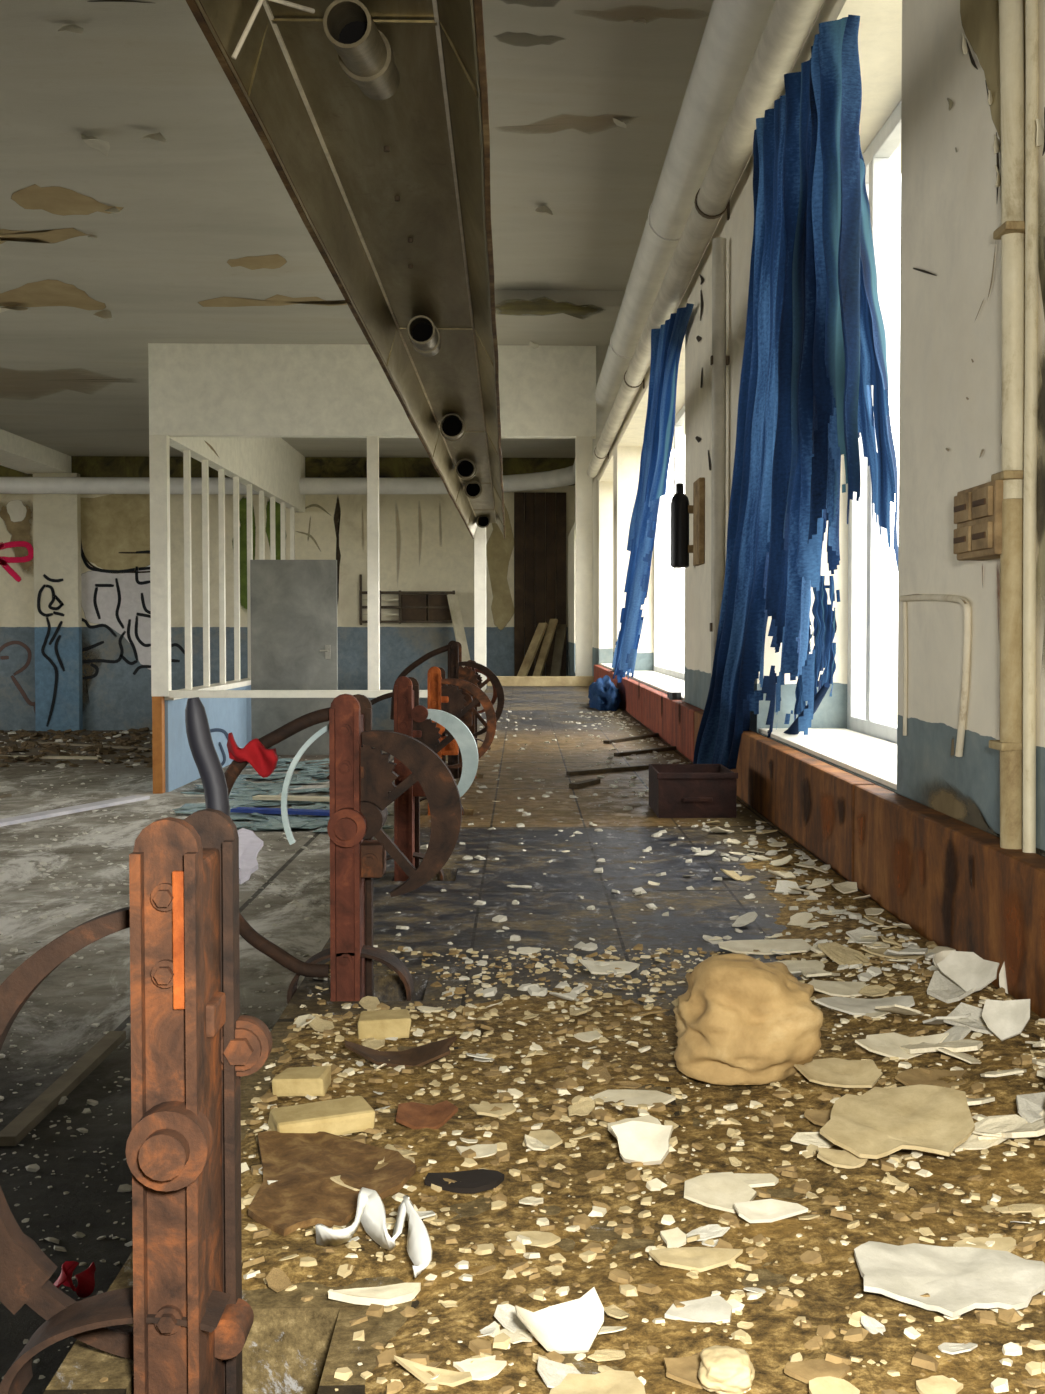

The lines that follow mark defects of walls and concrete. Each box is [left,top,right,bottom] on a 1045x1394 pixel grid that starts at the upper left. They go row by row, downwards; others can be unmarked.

peeling [960,0,1001,187]
peeling [1036,119,1045,146]
peeling [0,184,124,244]
peeling [227,254,287,270]
peeling [0,280,112,319]
peeling [198,294,347,307]
water stain [1036,350,1045,605]
corrosion [942,846,972,946]
corrosion [1003,899,1022,986]